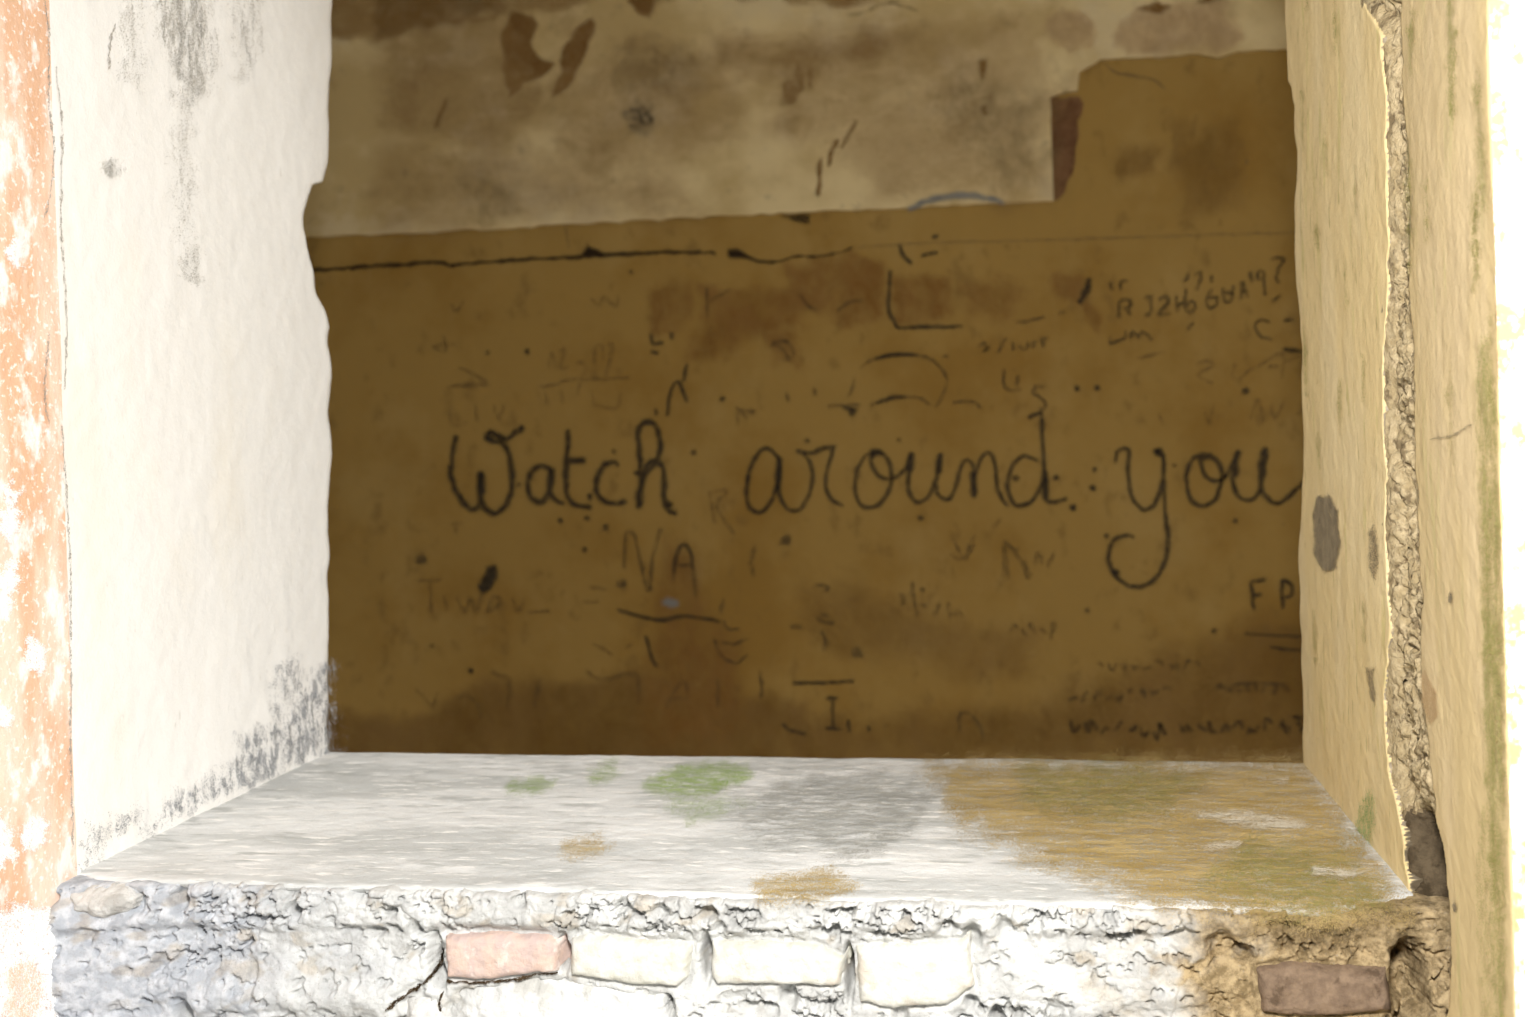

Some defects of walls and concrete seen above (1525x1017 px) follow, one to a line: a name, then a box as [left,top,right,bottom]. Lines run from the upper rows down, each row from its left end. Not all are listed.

leakage [331,0,593,47]
leakage [1443,1,1490,292]
peeling [3,233,27,269]
spalling [1361,0,1449,897]
peeling [0,478,27,621]
peeling [20,633,48,674]
leakage [1473,309,1509,1017]
leakage [76,532,1421,945]
peeling [0,808,51,872]
crack [385,941,558,1012]
spalling [0,875,1452,1017]